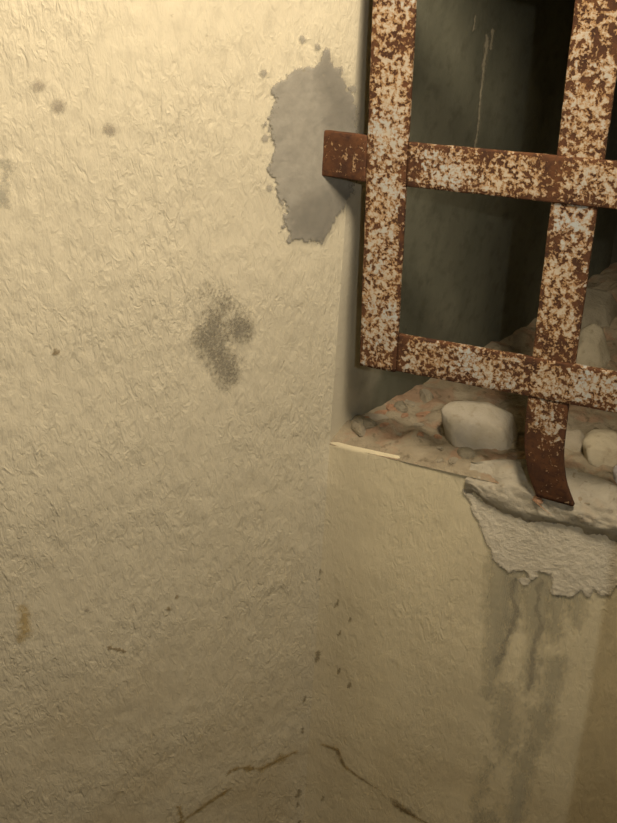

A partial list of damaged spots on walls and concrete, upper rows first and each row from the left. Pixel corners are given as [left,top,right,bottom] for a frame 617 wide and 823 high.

peeling [462,489,617,598]